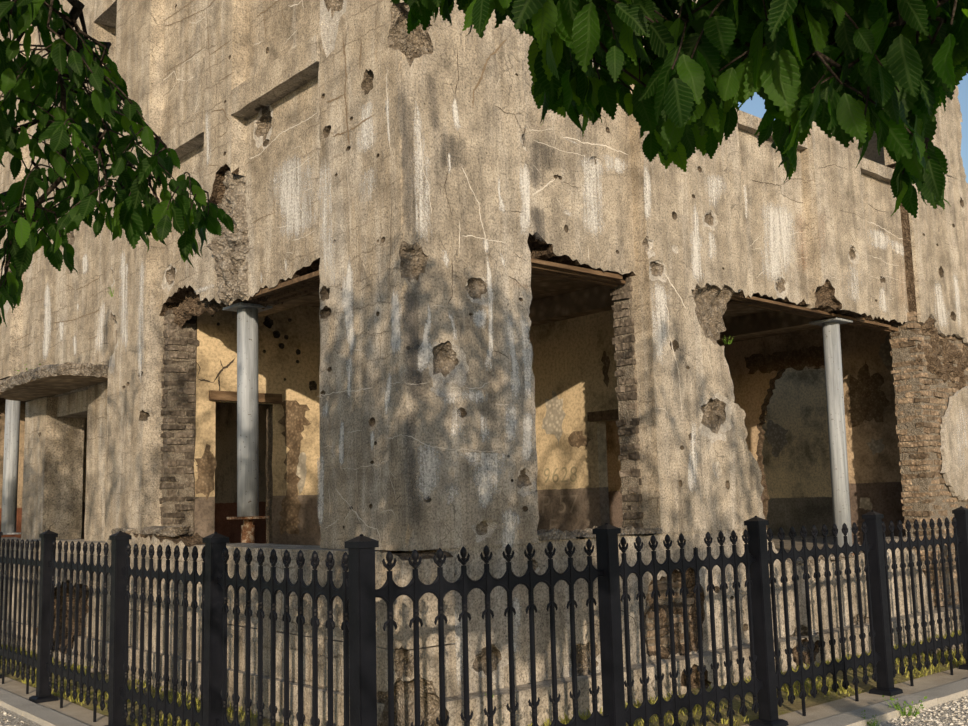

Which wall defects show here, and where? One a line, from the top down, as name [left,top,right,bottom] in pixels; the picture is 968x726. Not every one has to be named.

spalling [320,0,347,57]
spalling [691,283,738,347]
flaking render [159,170,250,536]
spalling [427,341,469,398]
spalling [698,392,734,443]
peeling [278,400,311,535]
flaking render [844,311,968,606]